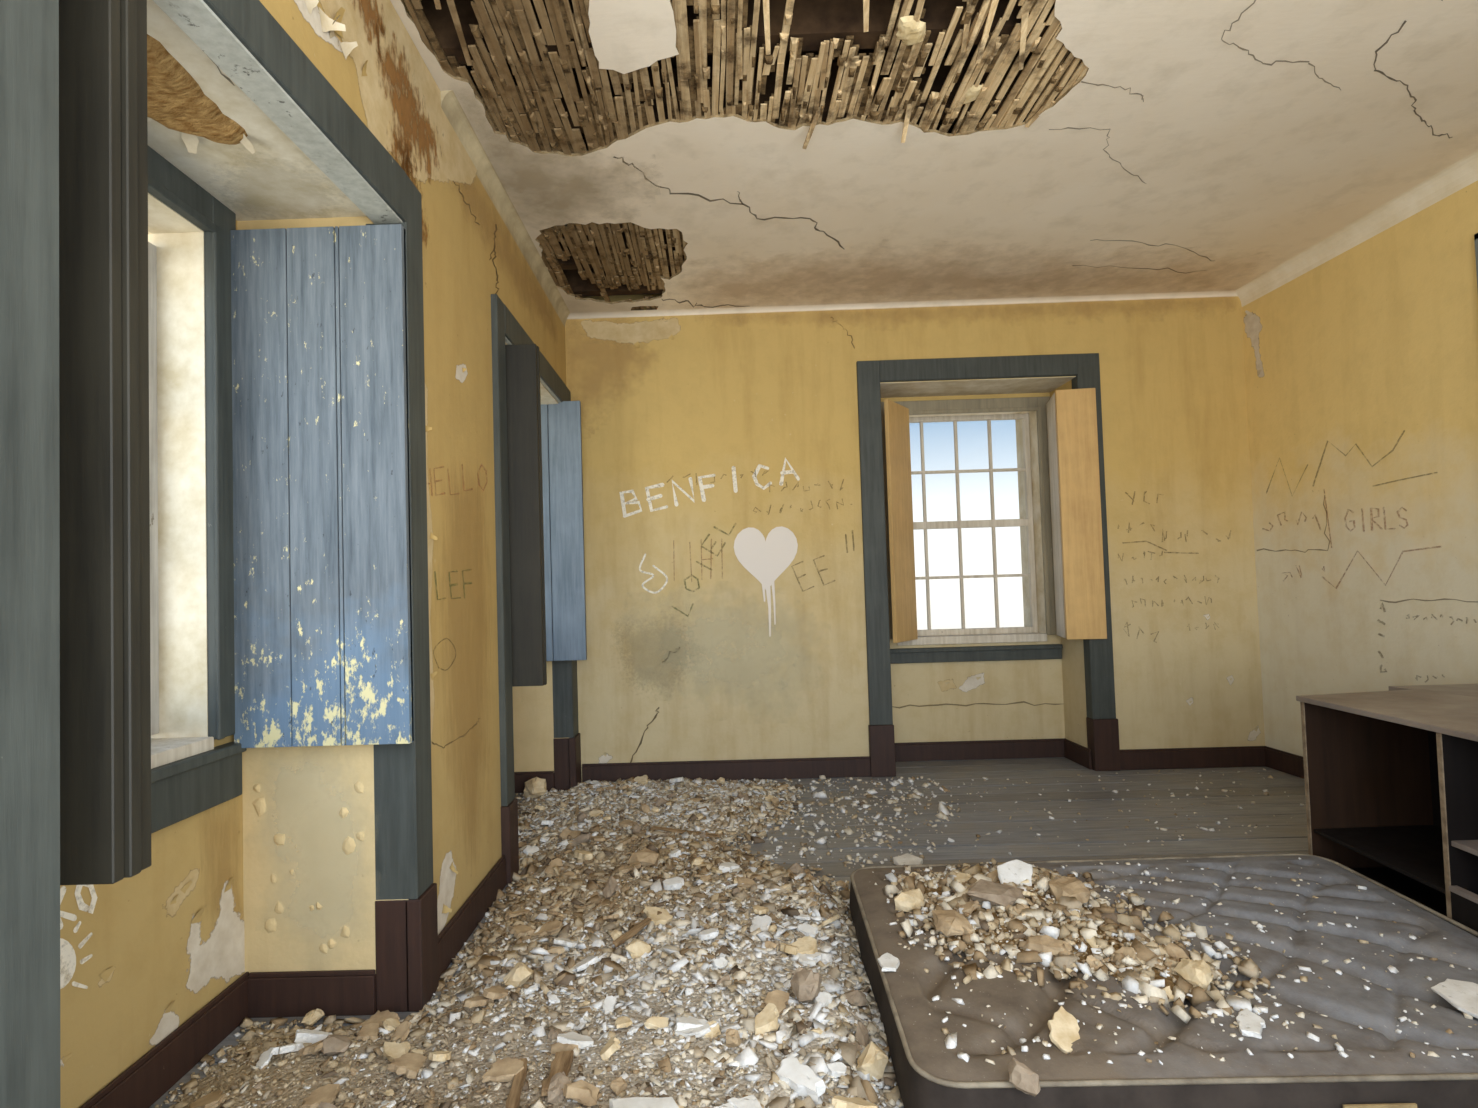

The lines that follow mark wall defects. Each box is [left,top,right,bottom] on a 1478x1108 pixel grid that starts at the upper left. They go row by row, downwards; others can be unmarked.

spalling [294,0,1088,186]
crack [1081,81,1144,102]
crack [1221,0,1341,90]
crack [1373,21,1452,138]
crack [1049,127,1146,184]
crack [613,156,844,249]
spalling [537,222,687,348]
crack [1072,239,1211,273]
peeling [437,851,458,935]
peeling [149,869,245,1045]